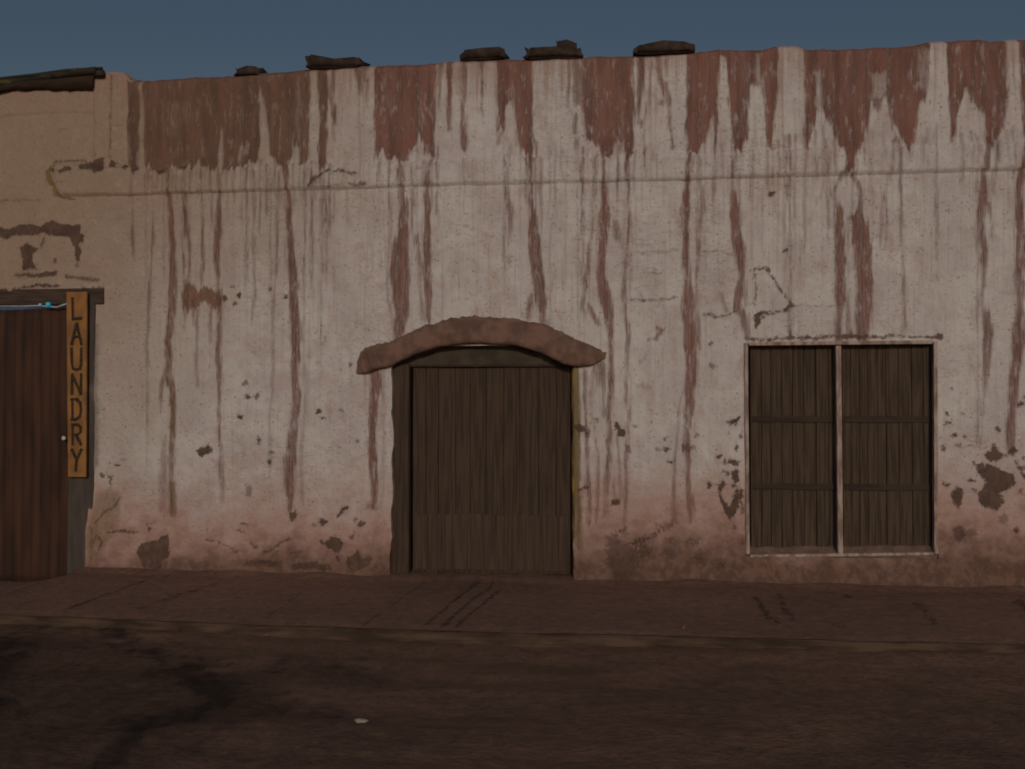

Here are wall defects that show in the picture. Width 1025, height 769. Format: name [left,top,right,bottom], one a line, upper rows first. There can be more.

peeling [0,220,84,288]
rust [183,284,222,311]
flaking render [708,416,744,519]
flaking render [942,426,1025,511]
flaking render [137,527,170,569]
flaking render [292,521,371,571]